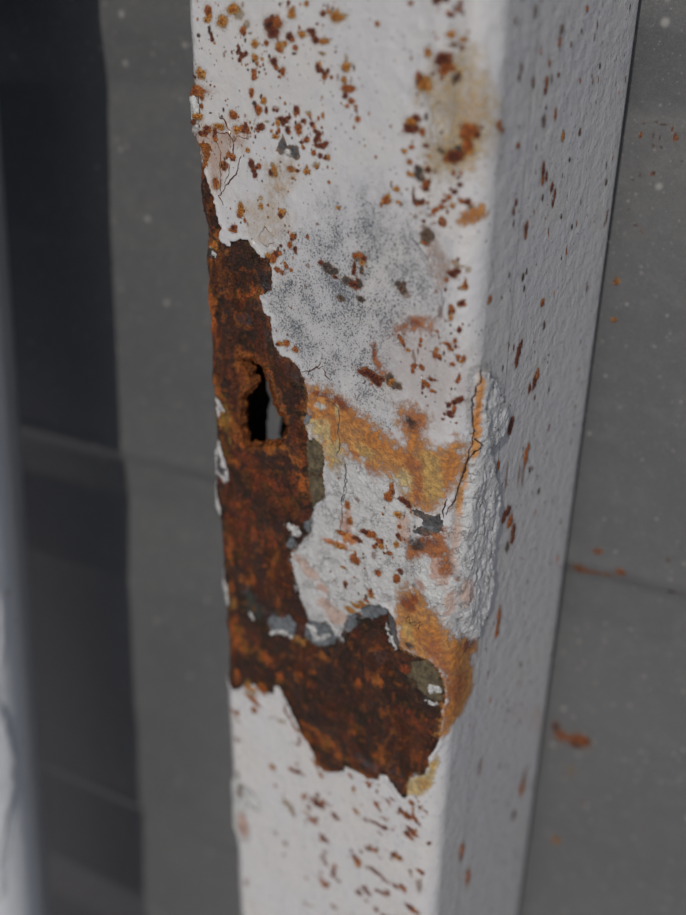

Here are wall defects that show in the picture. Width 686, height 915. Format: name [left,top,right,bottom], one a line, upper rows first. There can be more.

corrosion [532,46,560,127]
crack [198,96,246,204]
corrosion [535,161,563,218]
peeling [266,197,446,427]
corrosion [508,340,534,368]
corrosion [190,0,508,915]
crack [442,370,484,518]
corrosion [523,443,553,504]
peeling [398,497,444,536]
corrosion [502,498,516,553]
corrosion [552,723,590,748]